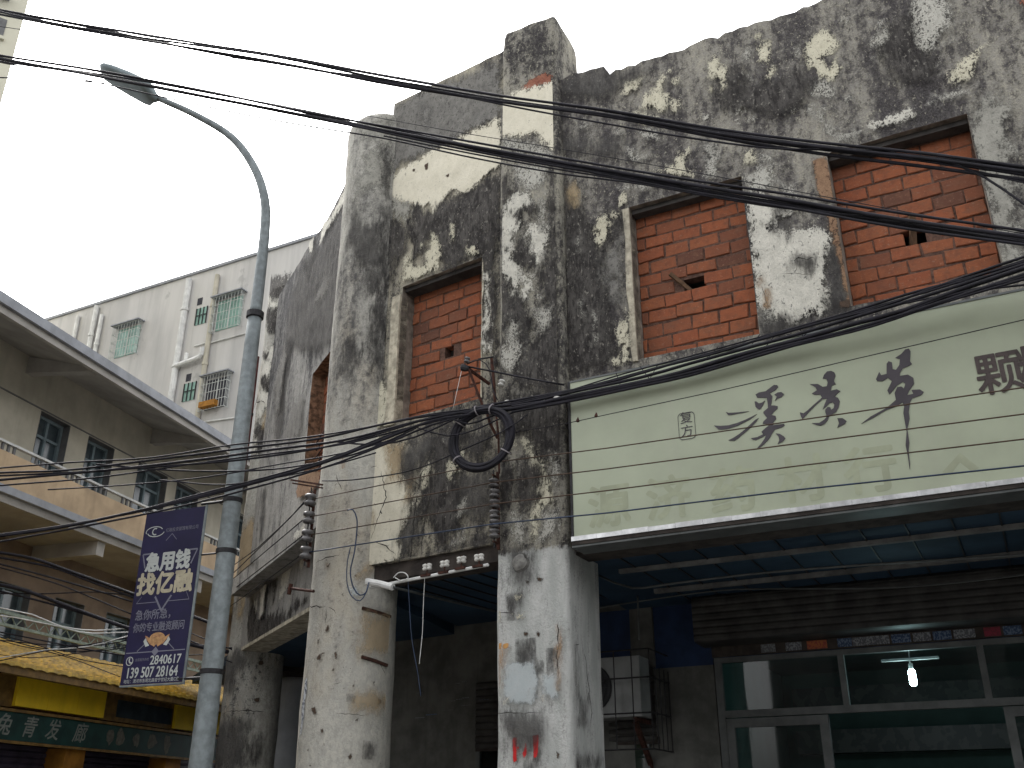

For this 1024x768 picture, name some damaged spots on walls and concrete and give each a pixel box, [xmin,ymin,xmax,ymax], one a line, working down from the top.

damp [561,64,641,98]
damp [712,62,816,118]
peeling [791,28,916,142]
damp [877,12,941,85]
peeling [309,72,554,372]
peeling [741,148,849,325]
damp [253,63,623,554]
peeling [252,346,304,455]